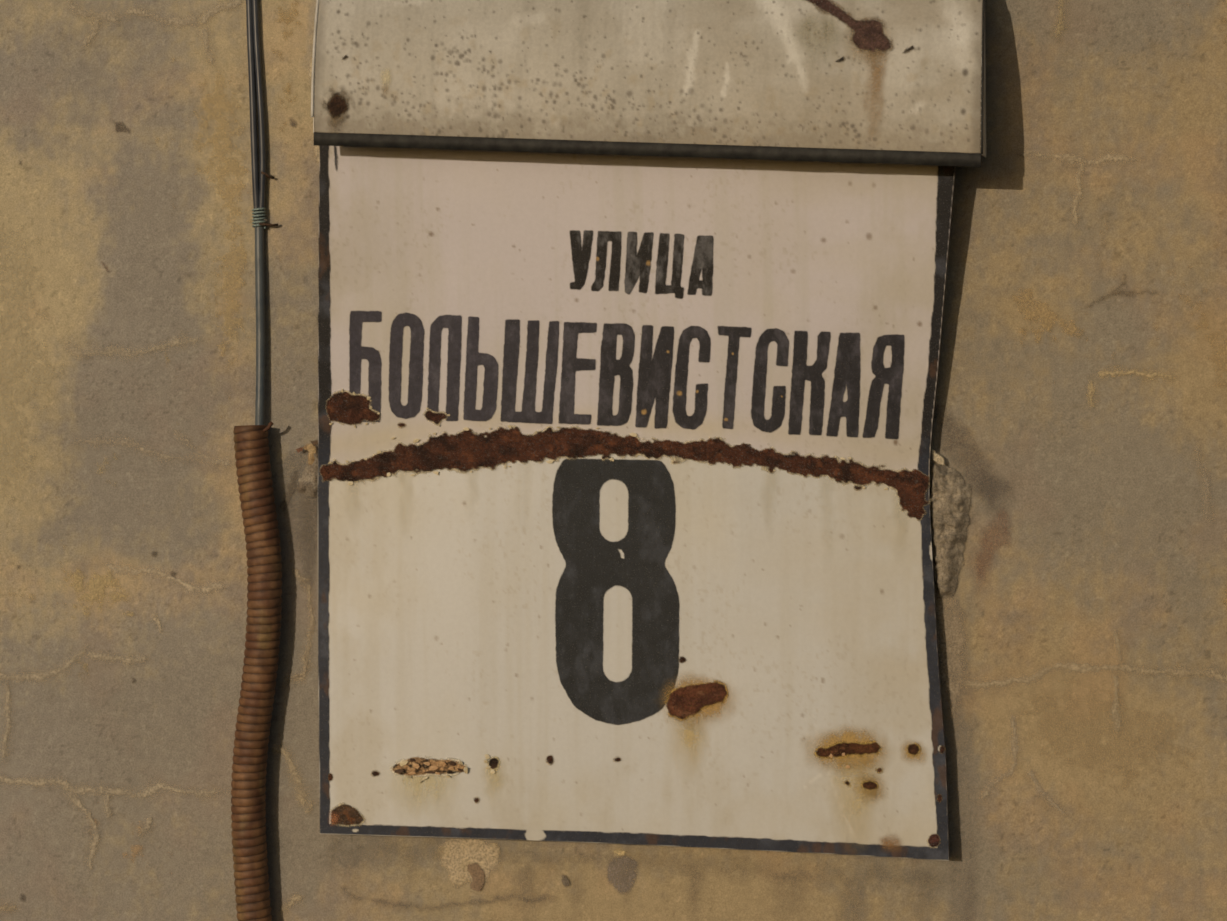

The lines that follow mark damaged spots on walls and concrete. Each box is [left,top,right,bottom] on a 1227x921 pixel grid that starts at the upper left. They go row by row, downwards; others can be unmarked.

crack [0,651,219,869]